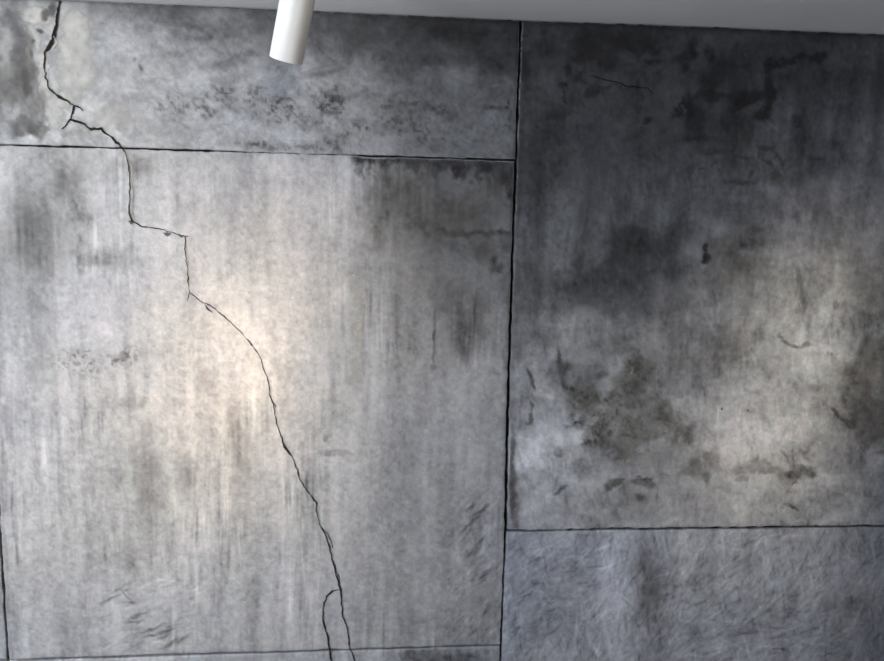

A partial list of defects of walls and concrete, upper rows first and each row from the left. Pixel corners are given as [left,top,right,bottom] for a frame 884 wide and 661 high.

damp [13,117,40,136]
damp [353,157,513,199]
crack [43,0,355,661]
damp [567,357,692,458]
damp [841,338,884,449]